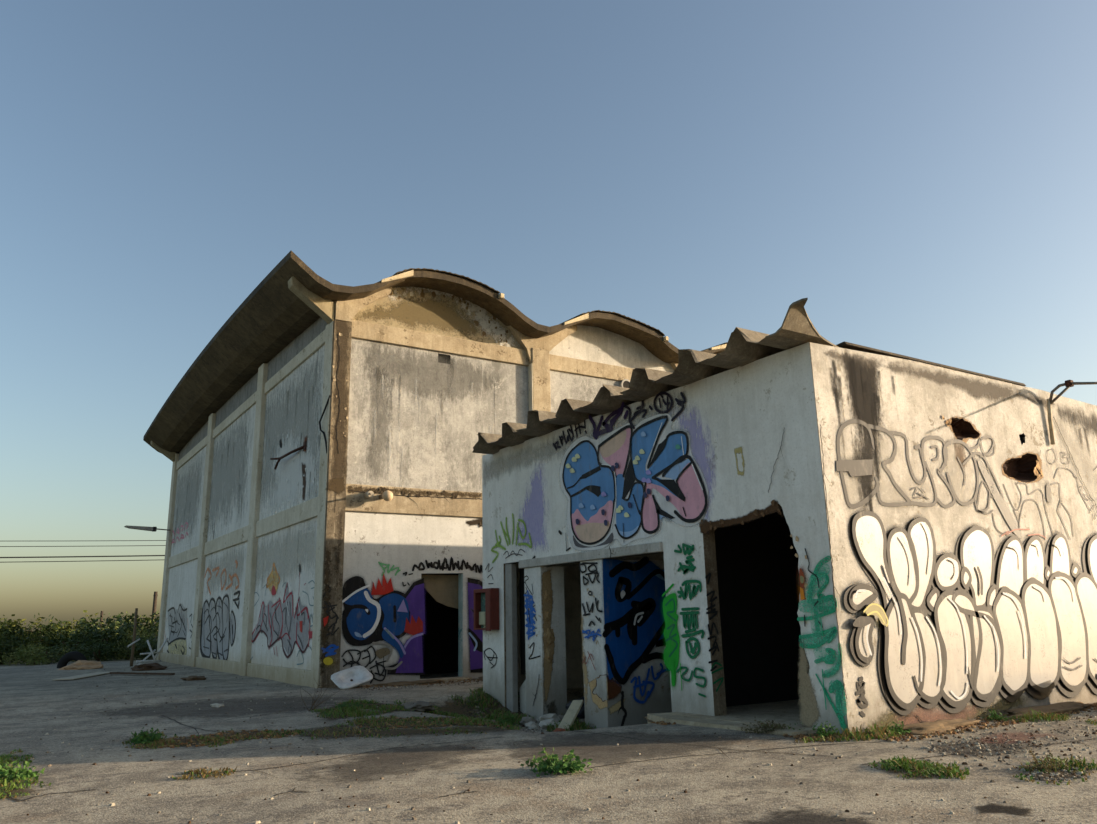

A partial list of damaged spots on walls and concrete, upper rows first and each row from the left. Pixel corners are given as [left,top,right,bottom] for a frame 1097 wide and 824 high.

water stain [331,297,478,571]
water stain [827,351,1097,512]
spalling [943,416,981,466]
spalling [1002,433,1043,483]
spalling [699,500,782,534]